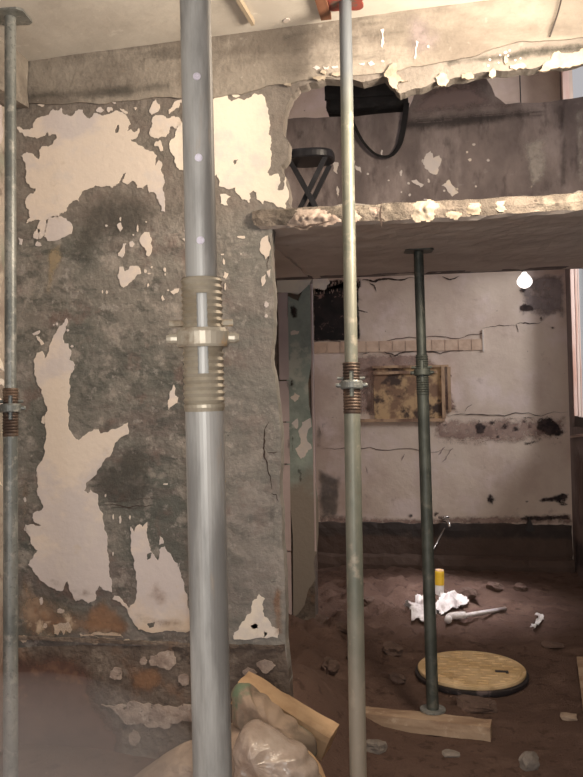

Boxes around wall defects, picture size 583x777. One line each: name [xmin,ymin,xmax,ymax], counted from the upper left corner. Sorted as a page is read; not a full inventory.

flaking render [360,60,408,93]
flaking render [538,48,583,72]
peeling [17,97,183,246]
peeling [213,93,341,230]
spalling [400,151,481,222]
peeling [118,221,152,257]
peeling [260,236,271,259]
peeling [117,266,152,288]
leakage [520,277,562,319]
crack [364,322,538,358]
peeling [24,318,190,633]
peeling [233,595,279,640]